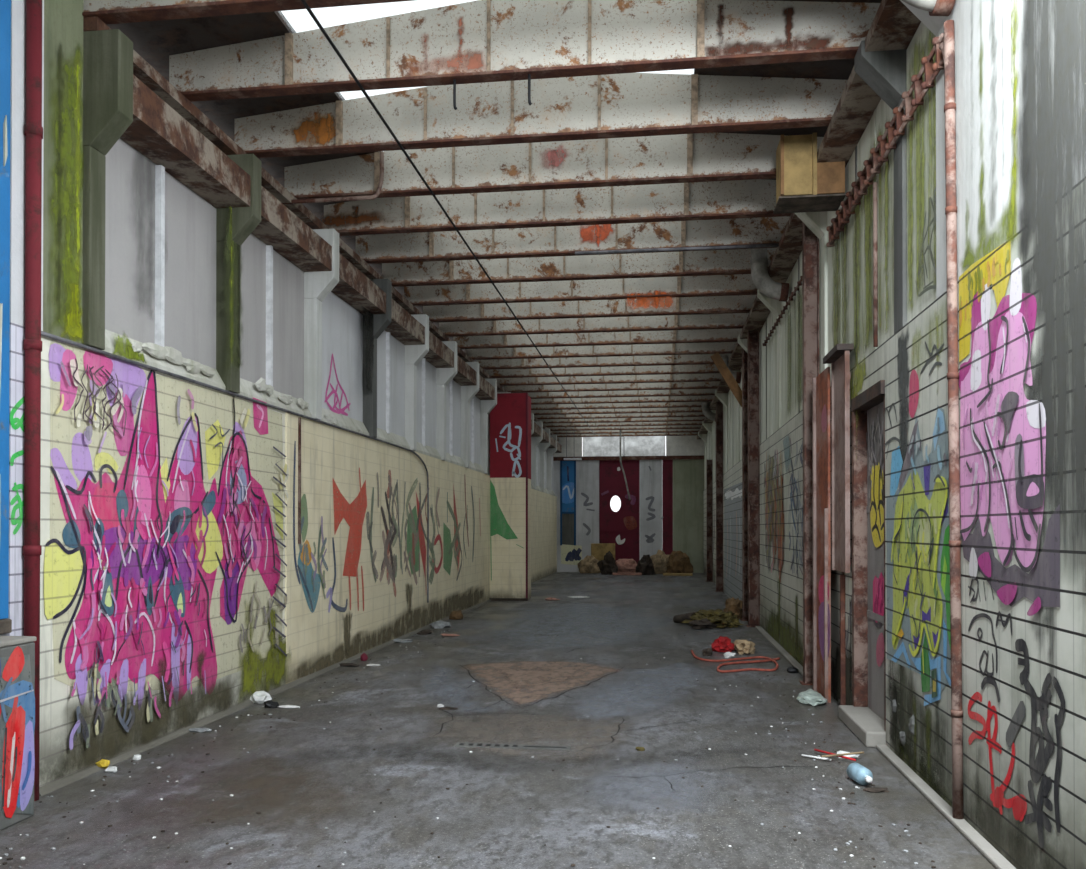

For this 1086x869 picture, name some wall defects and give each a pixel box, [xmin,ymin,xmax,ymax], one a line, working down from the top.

rust [414,18,484,72]
rust [706,4,831,56]
rust [292,113,336,145]
damp [57,168,80,296]
rust [320,206,385,227]
damp [909,48,936,309]
damp [1011,0,1086,566]
damp [297,584,483,679]
damp [1039,607,1054,693]
damp [66,654,231,768]
damp [889,662,946,796]